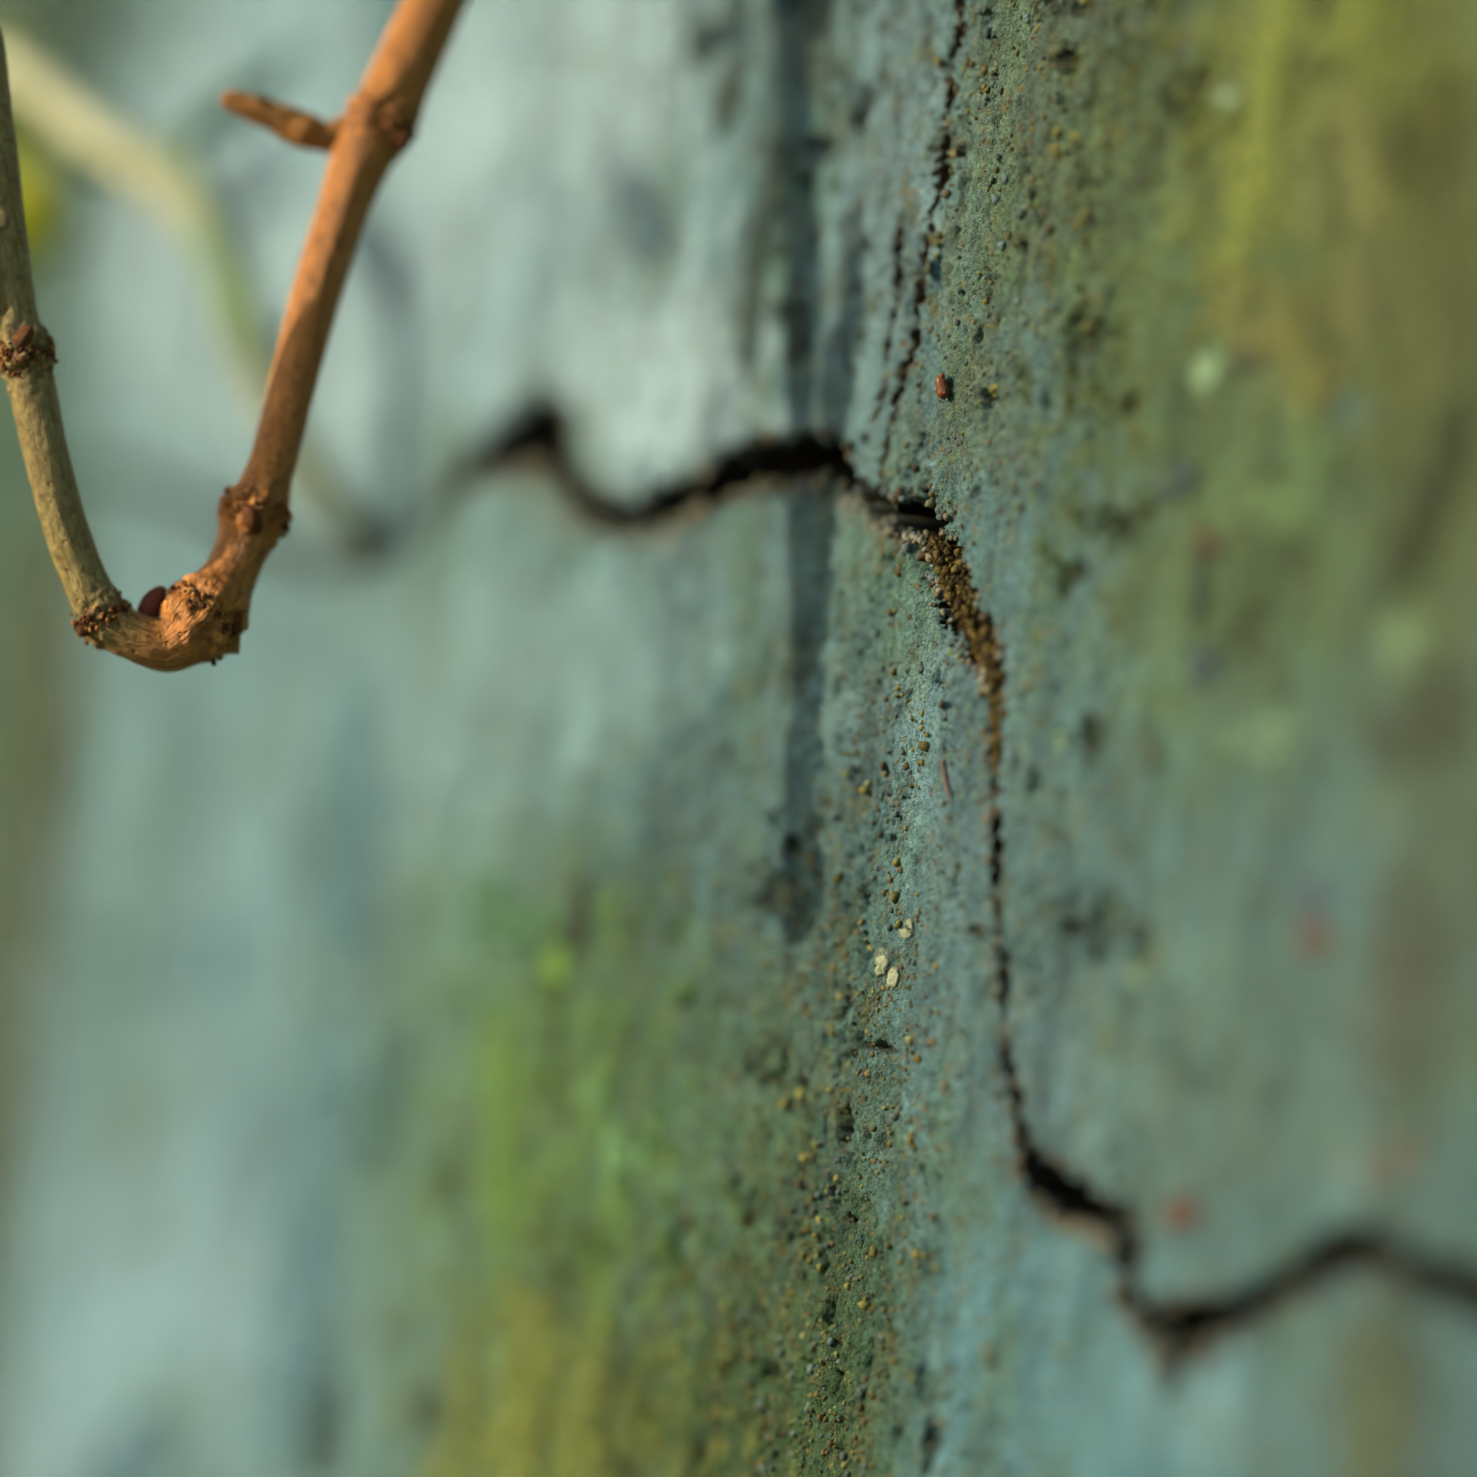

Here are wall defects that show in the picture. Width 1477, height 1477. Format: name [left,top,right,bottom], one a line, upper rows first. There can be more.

crack [72,464,220,527]
crack [267,0,1477,1398]